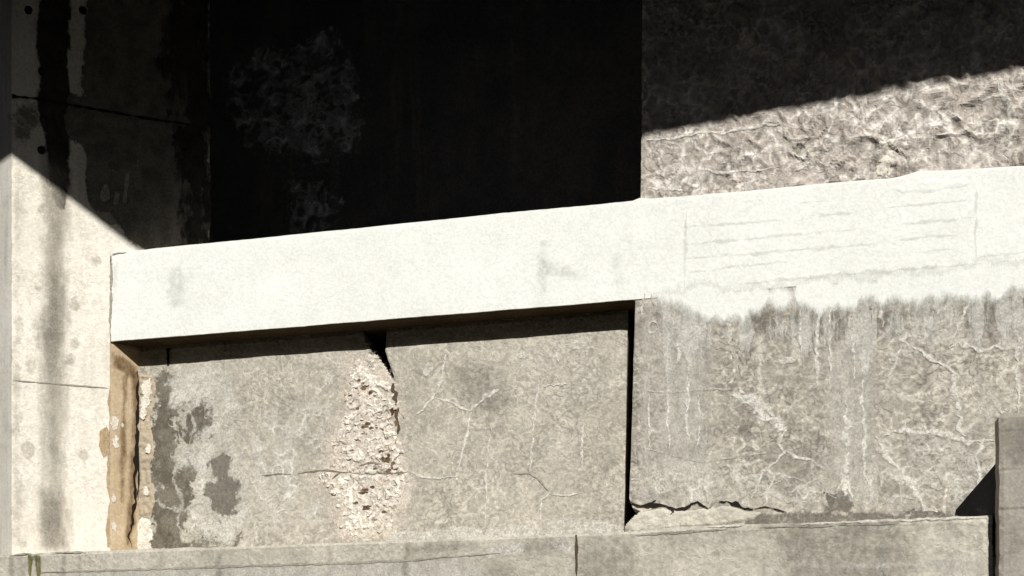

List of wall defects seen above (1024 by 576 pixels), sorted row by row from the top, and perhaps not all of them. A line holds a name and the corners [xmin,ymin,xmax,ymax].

leakage [14,0,211,467]
leakage [43,498,60,543]
rust [99,356,138,547]
leakage [155,361,330,549]
crack [11,355,500,573]
spalling [299,344,417,542]
crack [513,343,584,520]
leakage [631,291,1024,524]